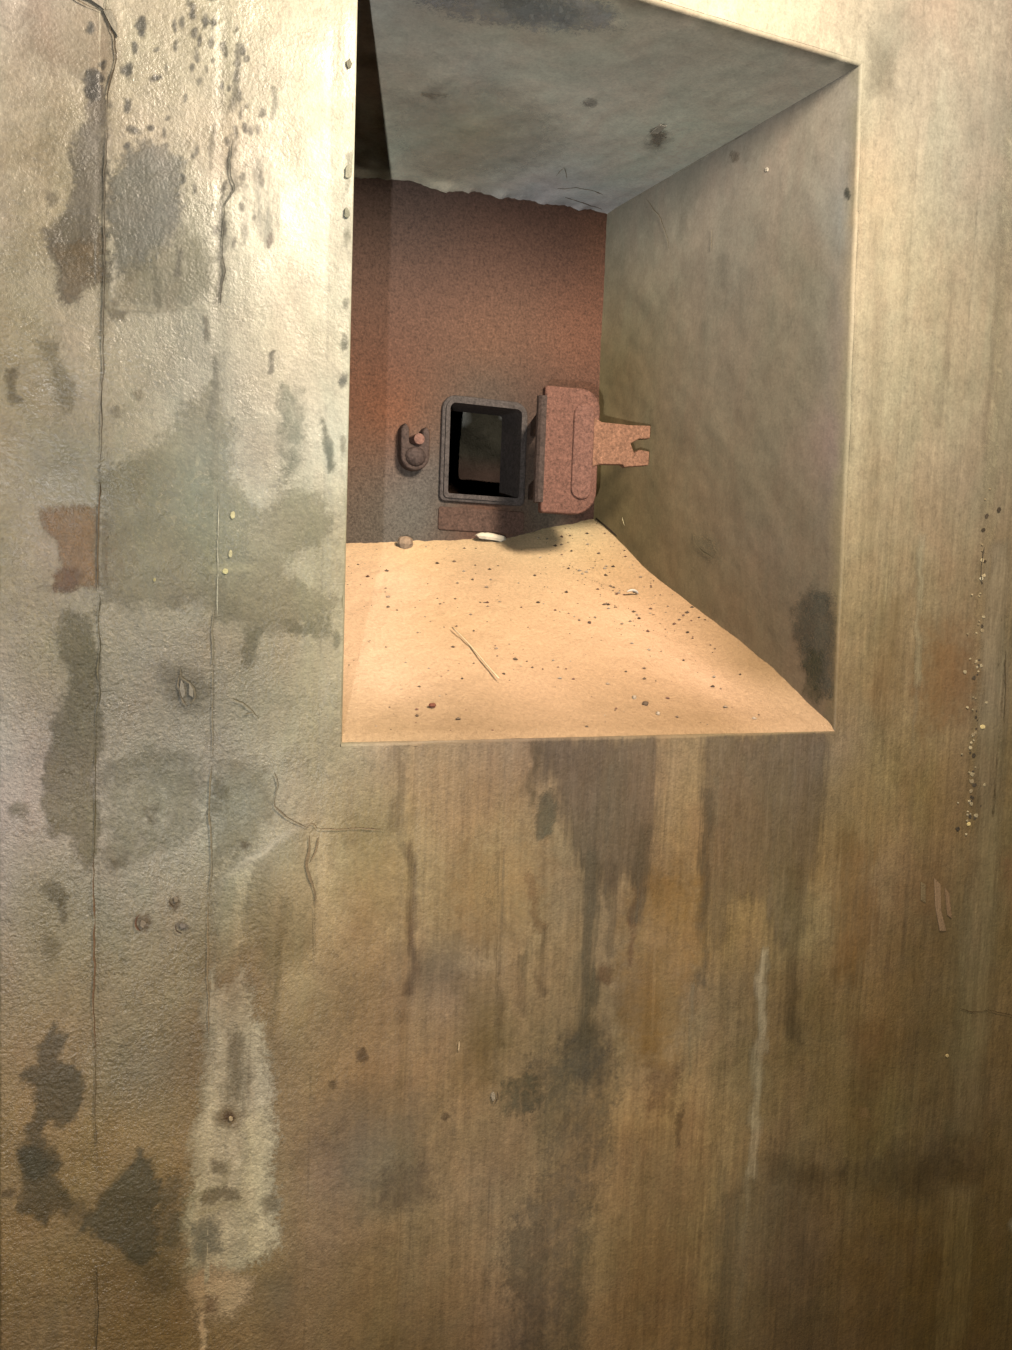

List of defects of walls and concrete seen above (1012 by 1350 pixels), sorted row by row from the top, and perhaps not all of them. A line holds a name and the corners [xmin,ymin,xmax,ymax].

crack [105,7,117,102]
damp [121,16,146,76]
damp [173,0,250,100]
damp [43,61,212,319]
damp [791,591,837,699]
damp [2,610,301,1350]
damp [500,736,656,1350]
damp [698,733,829,1204]